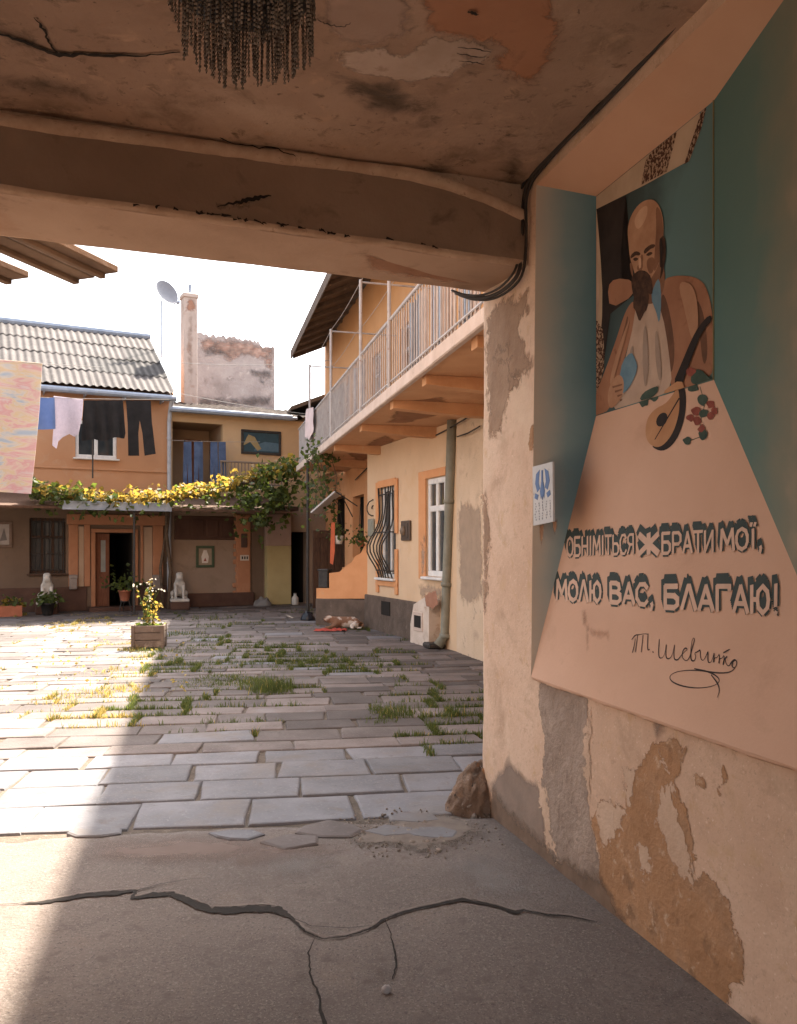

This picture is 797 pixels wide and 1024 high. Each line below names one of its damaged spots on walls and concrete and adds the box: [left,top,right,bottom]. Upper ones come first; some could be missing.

crack [0,18,180,58]
flaking render [326,0,558,82]
flaking render [484,290,533,437]
flaking render [538,682,744,1003]
crack [9,877,597,1024]